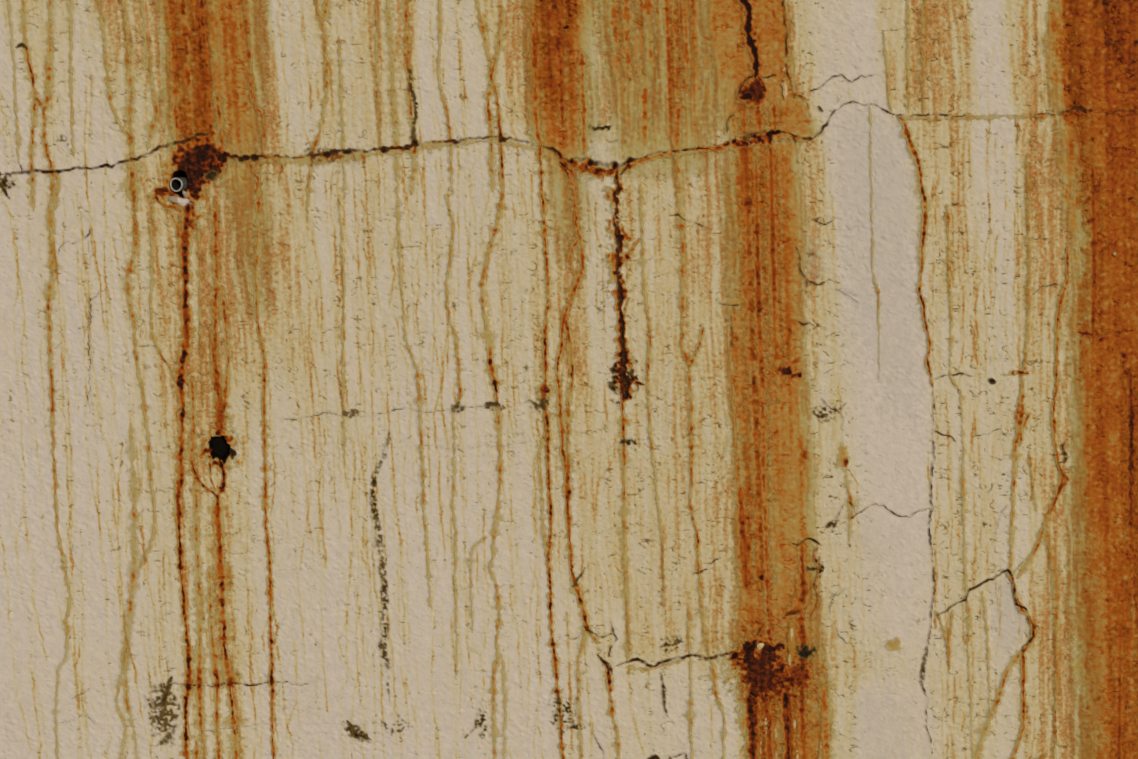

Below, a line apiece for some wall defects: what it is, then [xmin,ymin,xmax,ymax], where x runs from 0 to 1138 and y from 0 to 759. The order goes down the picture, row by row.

crack [79,298,93,399]
crack [0,133,207,175]
rust [97,0,278,759]
rust [522,0,836,759]
crack [227,0,1138,753]
rust [937,204,1027,759]
rust [1008,0,1138,759]